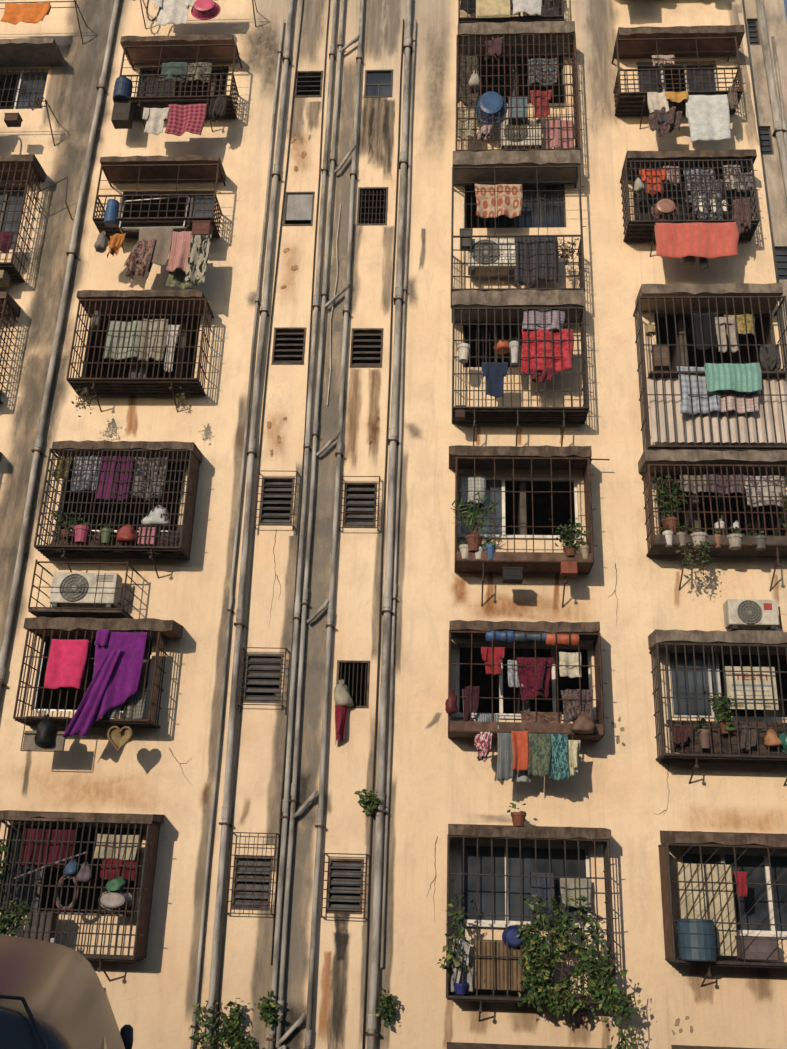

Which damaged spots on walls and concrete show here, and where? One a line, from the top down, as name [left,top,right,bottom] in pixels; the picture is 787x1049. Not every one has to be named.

leakage [0,0,119,640]
rust [127,395,137,432]
rust [346,370,380,463]
crack [269,534,281,623]
leakage [252,66,395,1049]
leakage [397,459,406,574]
rust [455,579,464,600]
rust [487,573,528,615]
rust [320,952,331,1030]